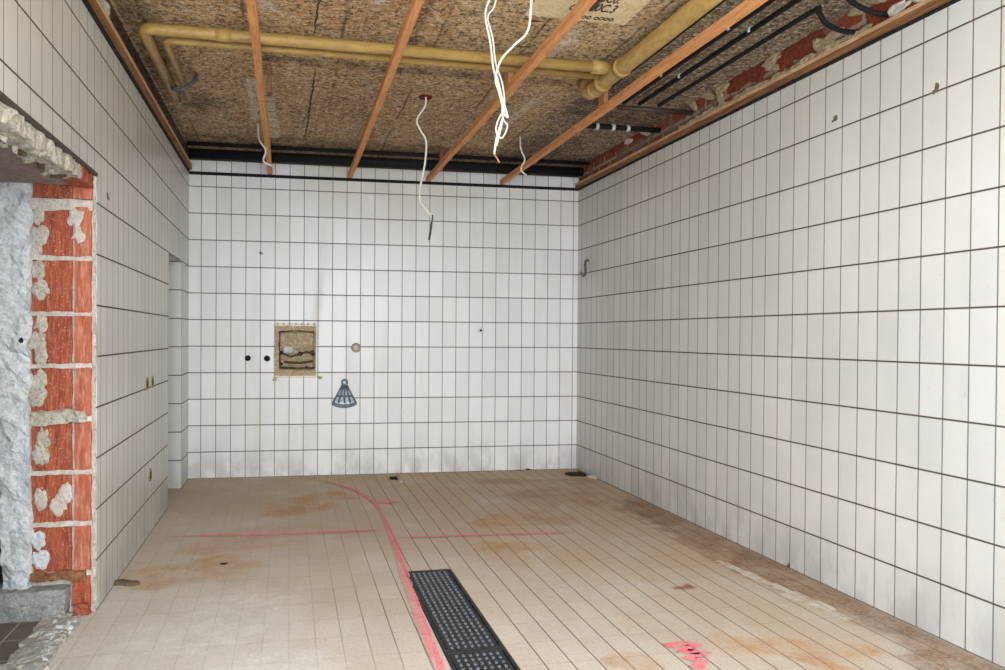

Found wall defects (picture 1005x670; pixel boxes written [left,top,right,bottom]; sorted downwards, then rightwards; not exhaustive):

spalling [0,101,94,189]
flaking render [30,207,50,301]
flaking render [67,208,85,244]
flaking render [28,315,48,407]
leakage [603,495,1002,670]
spalling [0,614,81,670]